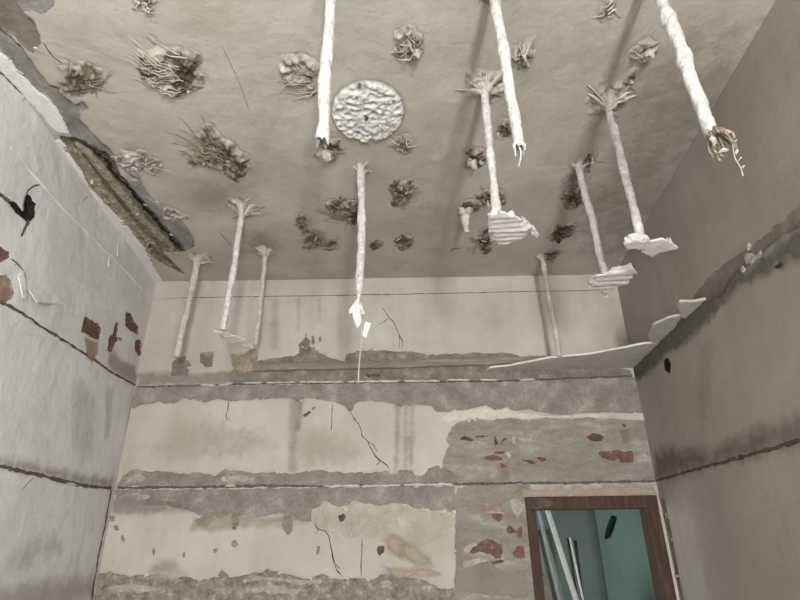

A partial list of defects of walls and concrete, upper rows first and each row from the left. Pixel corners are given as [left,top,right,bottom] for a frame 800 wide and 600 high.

flaking render [0,0,195,274]
flaking render [81,312,142,356]
crack [0,300,632,421]
crack [238,291,546,348]
leakage [633,232,800,379]
peeling [693,203,800,304]
peeling [94,346,656,600]
crack [0,405,800,600]